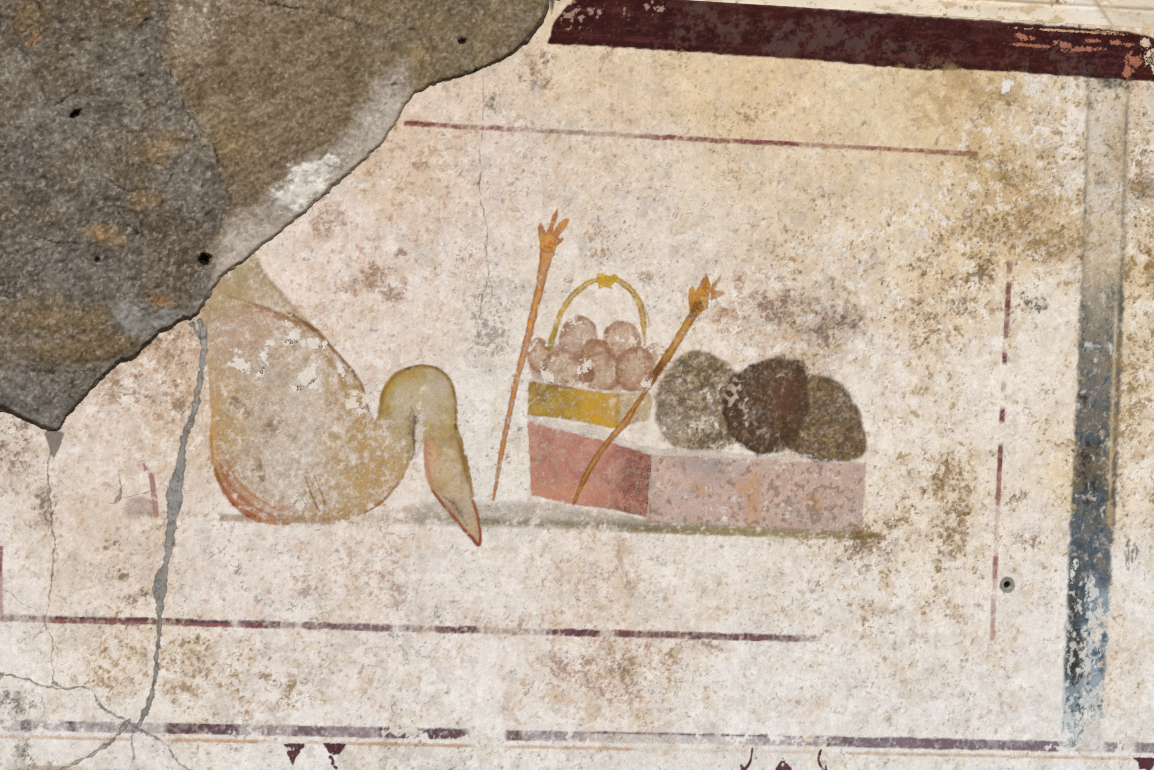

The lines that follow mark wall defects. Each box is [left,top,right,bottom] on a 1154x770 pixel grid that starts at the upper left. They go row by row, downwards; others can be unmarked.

flaking render [0,0,549,431]
peeling [1003,27,1154,82]
crack [7,318,208,770]